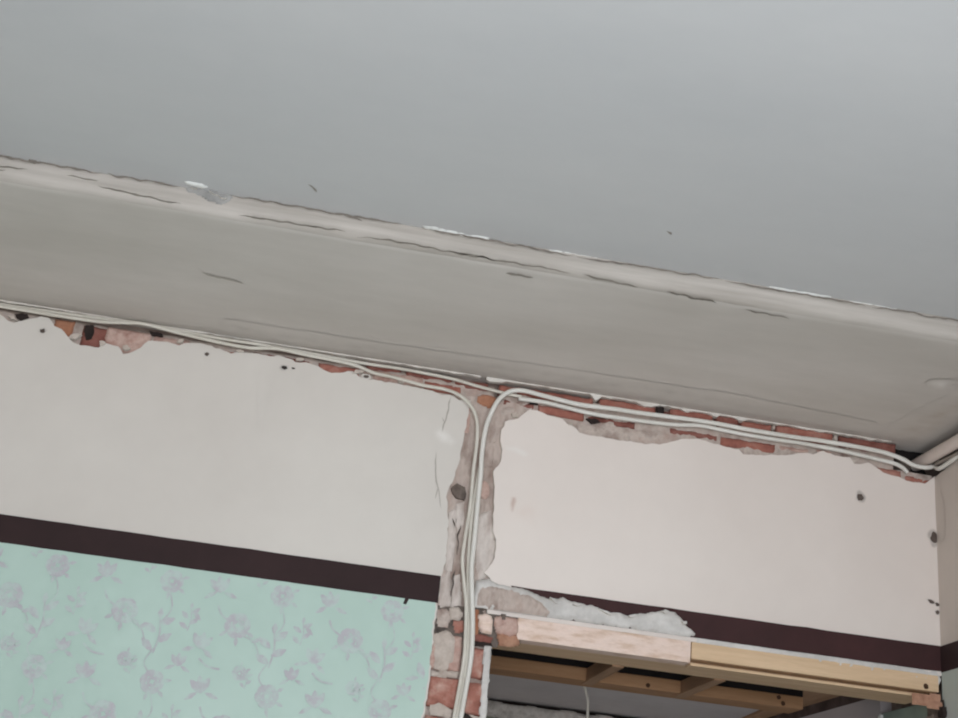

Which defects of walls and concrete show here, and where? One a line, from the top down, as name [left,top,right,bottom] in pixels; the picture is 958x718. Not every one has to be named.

flaking render [0,300,958,484]
spalling [451,483,466,501]